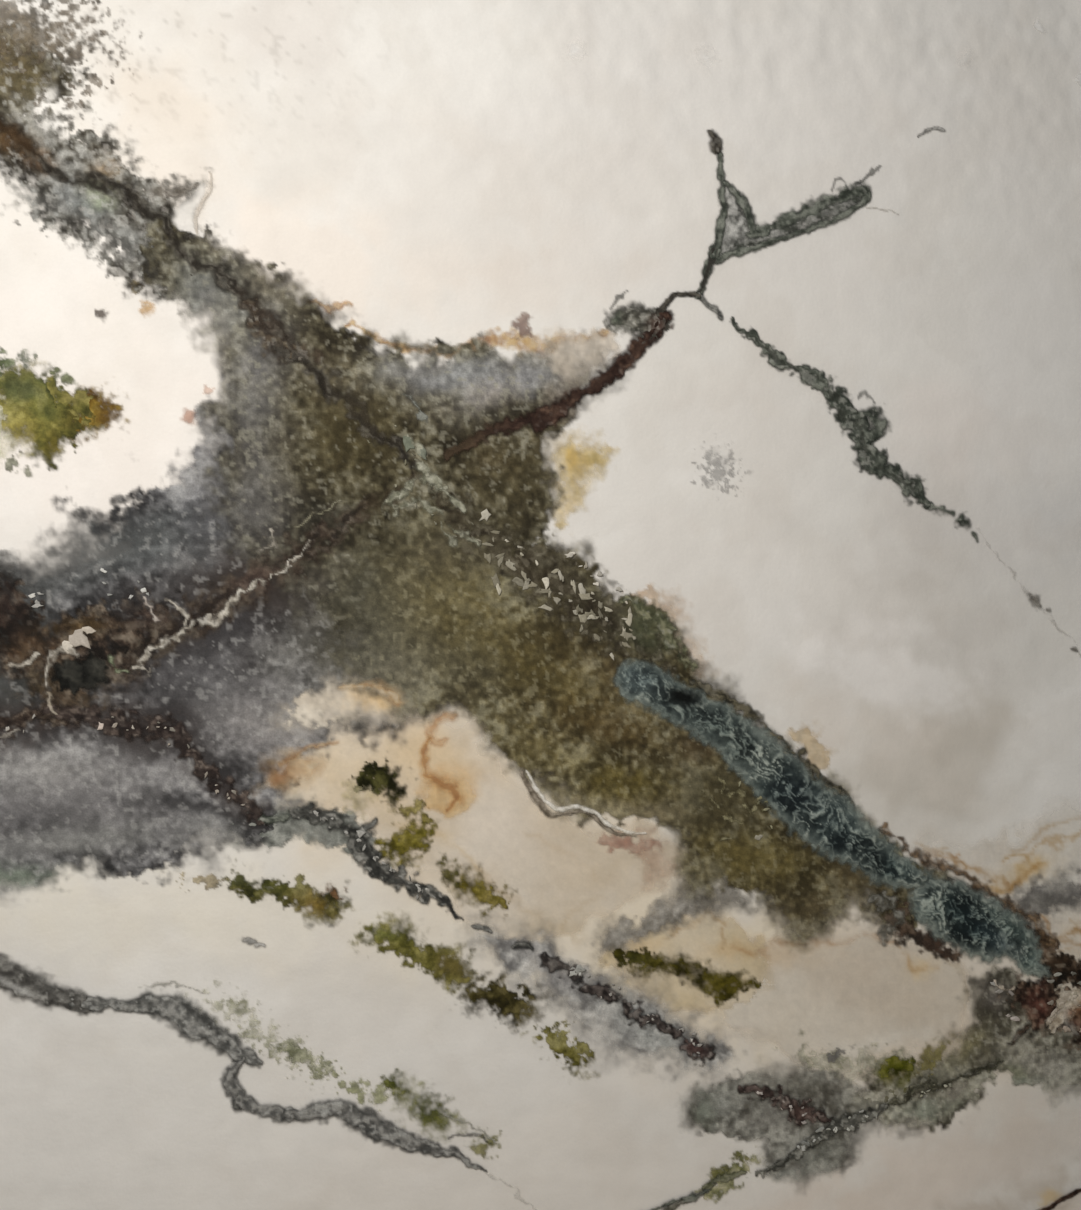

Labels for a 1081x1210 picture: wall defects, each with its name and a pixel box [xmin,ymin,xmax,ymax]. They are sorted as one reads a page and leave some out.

leakage [0,0,918,1070]
crack [0,121,978,804]
crack [1030,594,1051,612]
crack [0,702,716,1063]
crack [699,775,772,841]
leakage [612,594,1081,977]
crack [0,954,487,1172]
crack [651,1059,1003,1210]
leakage [603,891,1081,1180]
crack [1041,1188,1081,1210]